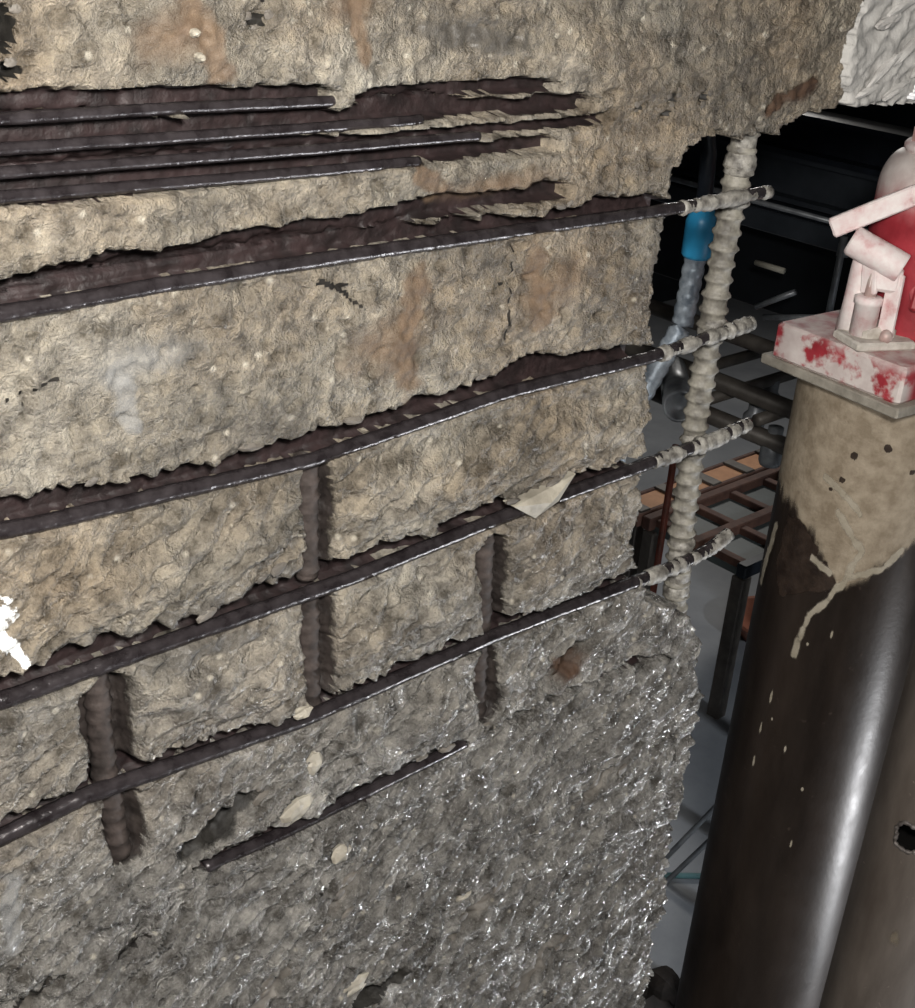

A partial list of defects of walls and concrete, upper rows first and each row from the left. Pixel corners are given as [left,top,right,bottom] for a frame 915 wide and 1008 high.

spalling [0,95,336,126]
spalling [0,114,482,205]
spalling [0,131,774,873]
damp [0,596,31,670]